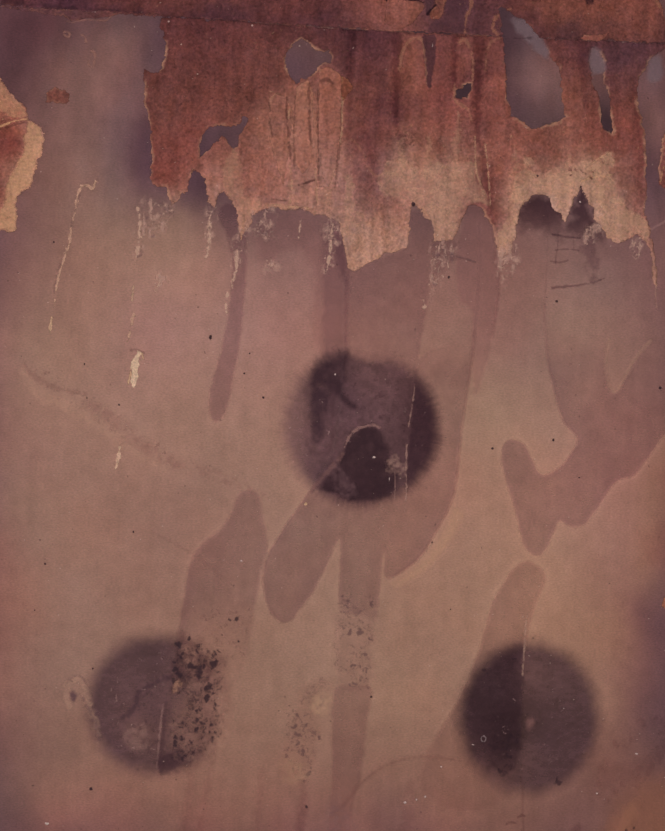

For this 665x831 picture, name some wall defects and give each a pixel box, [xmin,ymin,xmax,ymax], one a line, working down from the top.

leakage [172,204,471,761]
leakage [435,365,665,748]